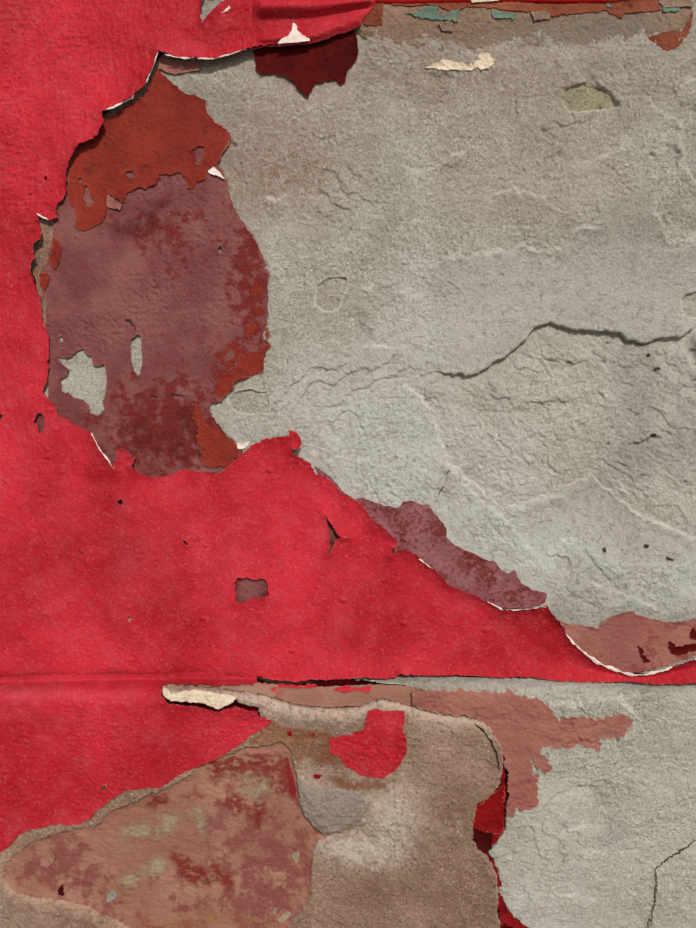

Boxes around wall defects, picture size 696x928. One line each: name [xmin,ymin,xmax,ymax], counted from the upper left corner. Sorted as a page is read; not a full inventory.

spalling [31,0,696,674]
crack [257,676,354,685]
crack [410,671,487,679]
spalling [0,765,201,928]
spalling [162,674,696,928]
crack [647,840,696,928]